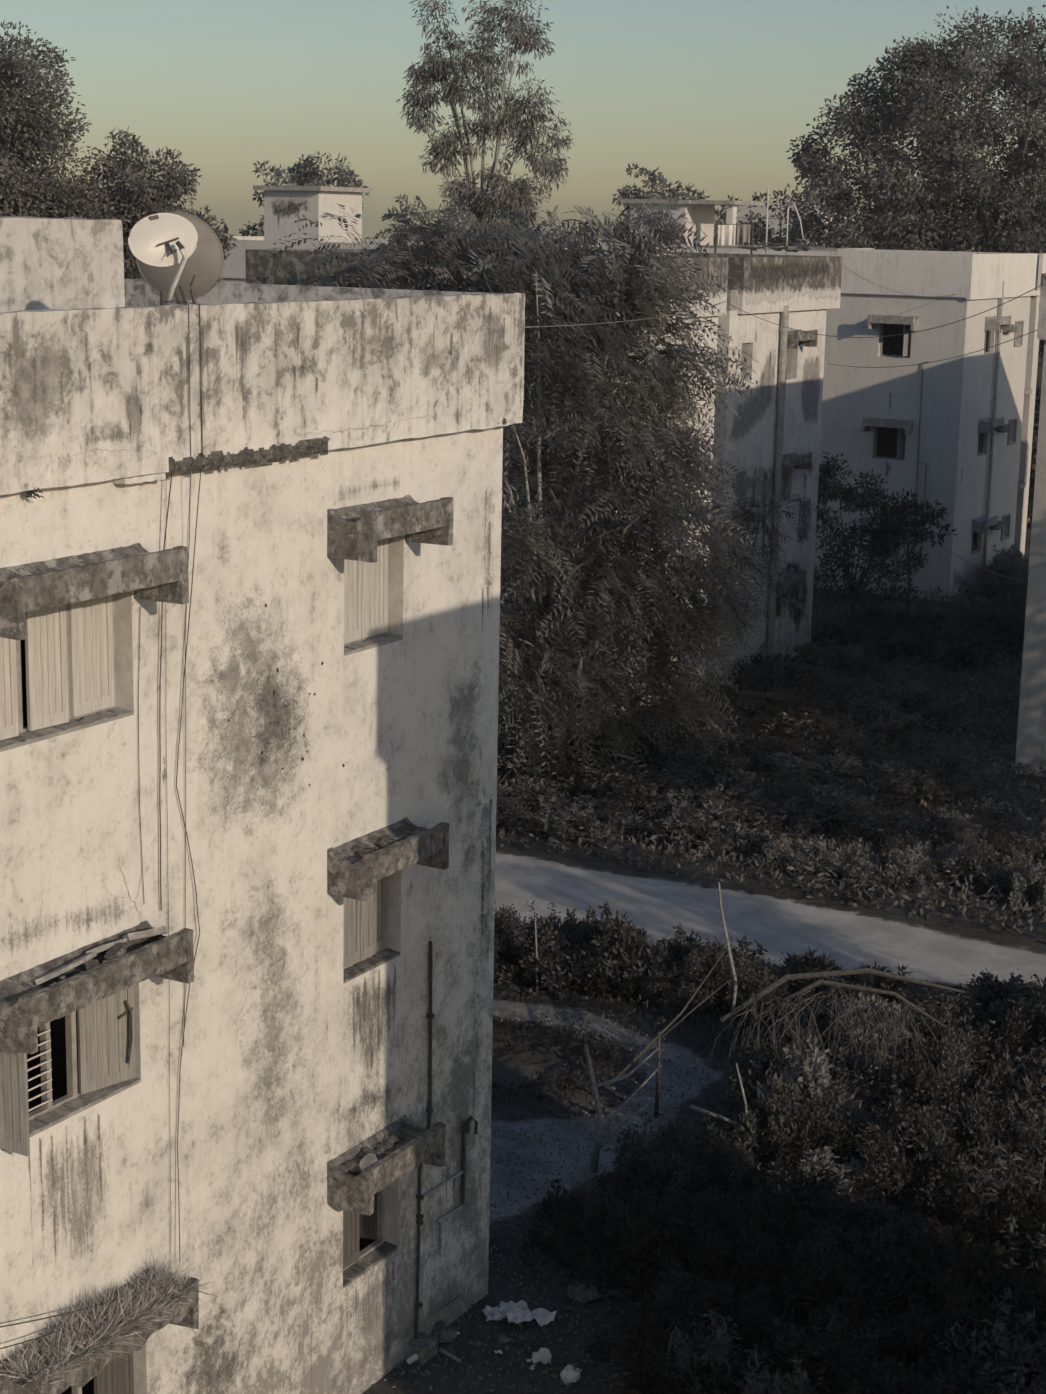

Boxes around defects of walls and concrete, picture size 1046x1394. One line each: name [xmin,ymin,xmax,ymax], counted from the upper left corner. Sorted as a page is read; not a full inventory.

water stain [6,333,91,439]
water stain [87,396,142,442]
water stain [179,324,209,414]
water stain [236,321,251,413]
water stain [275,316,318,391]
water stain [421,333,453,375]
water stain [353,966,395,1066]
water stain [29,1115,103,1252]